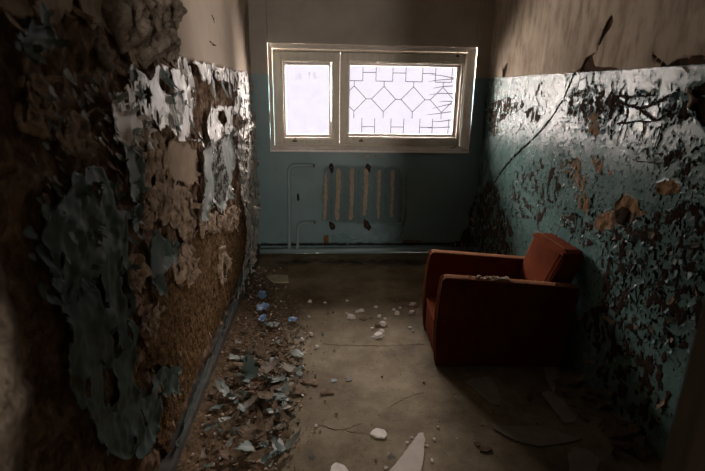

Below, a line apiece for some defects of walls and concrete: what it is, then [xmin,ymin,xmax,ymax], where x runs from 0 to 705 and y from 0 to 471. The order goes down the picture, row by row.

spalling [565,16,620,77]
spalling [650,49,705,72]
peeling [484,97,540,137]
crack [493,53,594,185]
peeling [566,84,621,137]
spalling [660,80,705,132]
peeling [0,0,307,467]
peeling [452,179,514,255]
peeling [511,138,705,440]